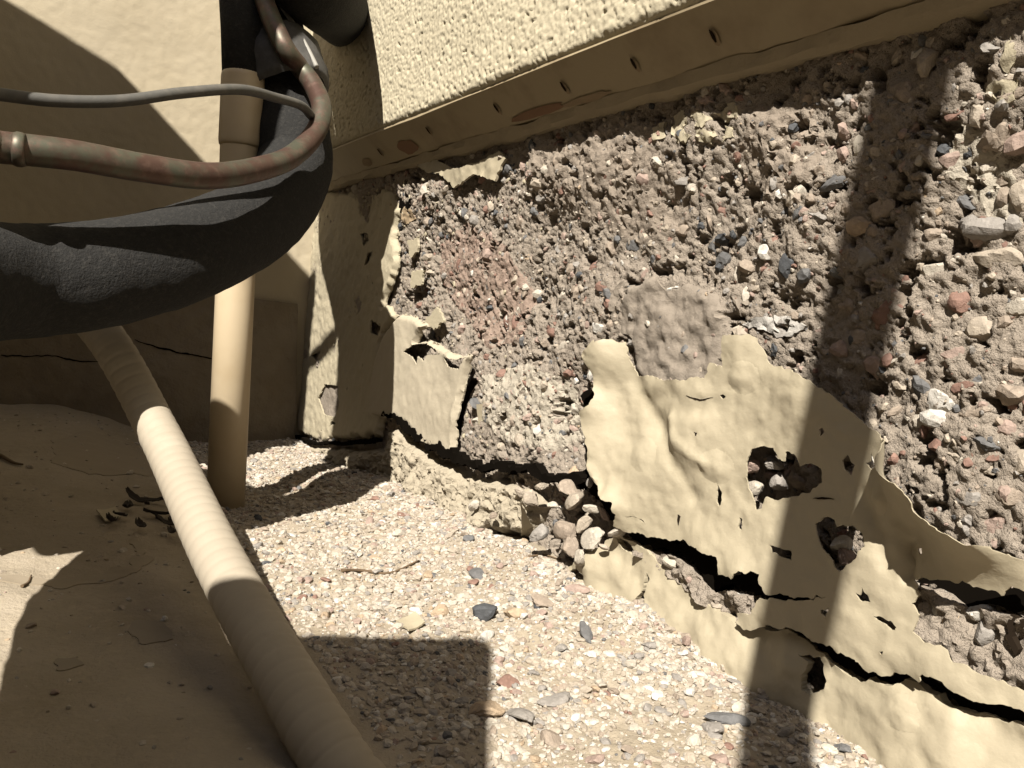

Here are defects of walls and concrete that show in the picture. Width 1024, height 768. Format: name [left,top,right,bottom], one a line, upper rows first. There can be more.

spalling [303,0,1024,712]
crack [916,578,1024,656]
crack [792,629,1024,722]